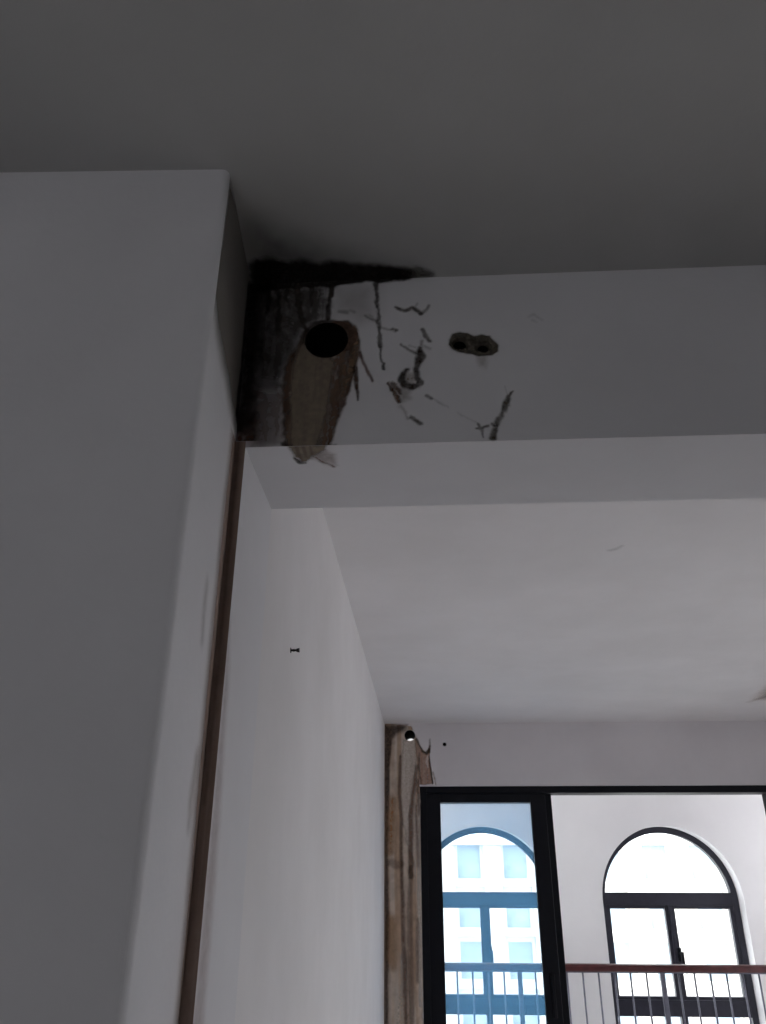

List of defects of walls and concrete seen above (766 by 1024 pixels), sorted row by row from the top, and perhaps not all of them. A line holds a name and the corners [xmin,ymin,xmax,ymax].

hole [449,332,498,356]
crack [476,391,513,440]
leakage [177,182,433,1024]
peeling [415,739,433,785]